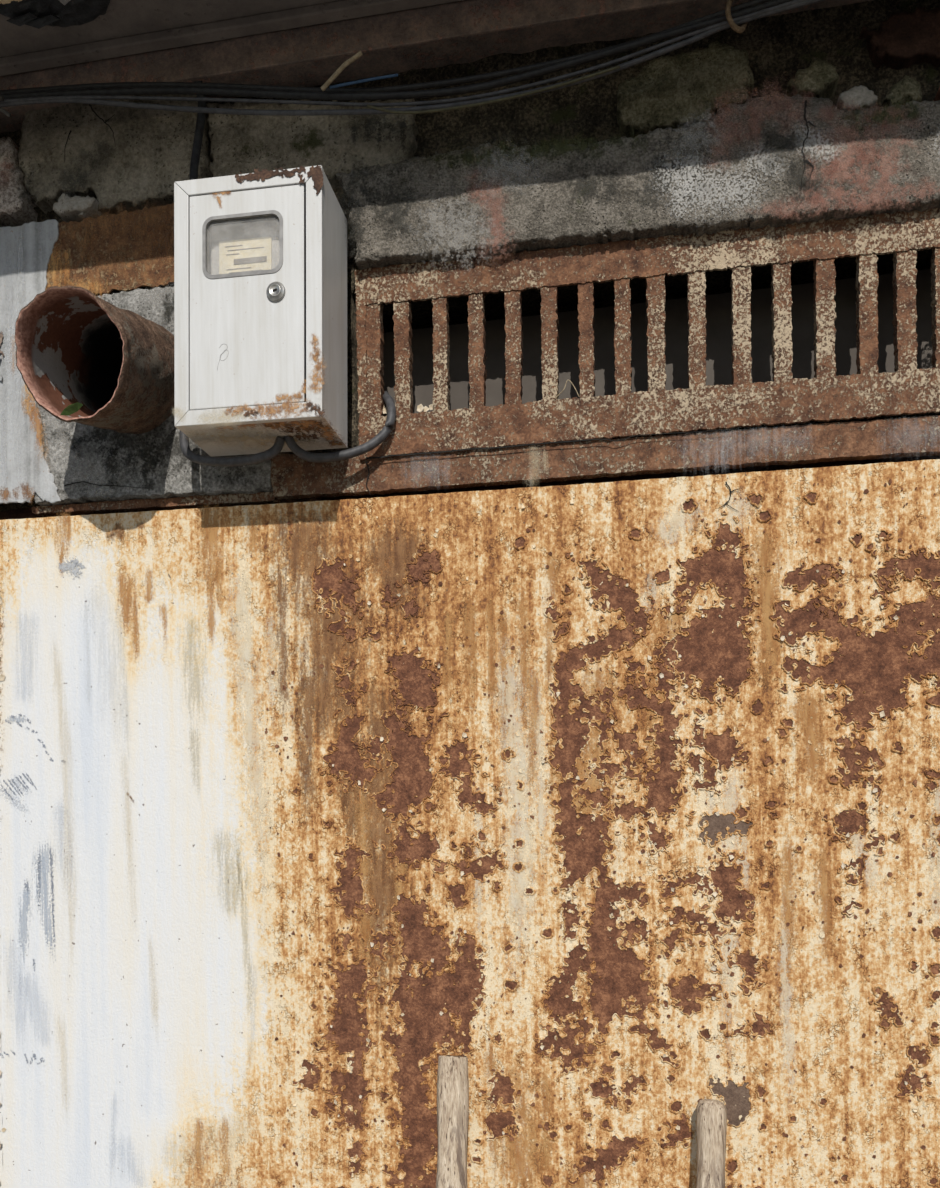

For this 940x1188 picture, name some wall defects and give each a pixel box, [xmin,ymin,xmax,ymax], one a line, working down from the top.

peeling [0,0,110,29]
crack [801,100,816,188]
rust [48,249,102,293]
rust [23,385,43,451]
water stain [53,414,273,489]
rust [217,335,342,446]
rust [468,1031,580,1187]